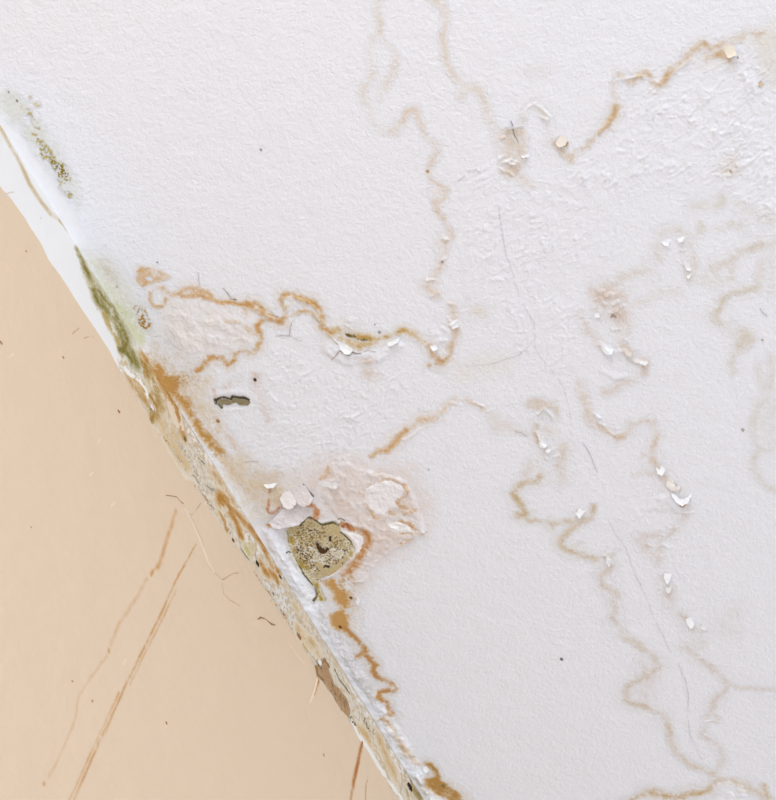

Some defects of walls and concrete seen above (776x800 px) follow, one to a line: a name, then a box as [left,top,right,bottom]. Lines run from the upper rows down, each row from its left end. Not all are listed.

leakage [0,84,83,233]
leakage [426,0,776,191]
spalling [219,398,250,409]
flaking render [163,419,243,550]
spalling [269,485,355,601]
leakage [67,243,776,800]
peeling [656,466,692,508]
flaking render [251,554,416,800]